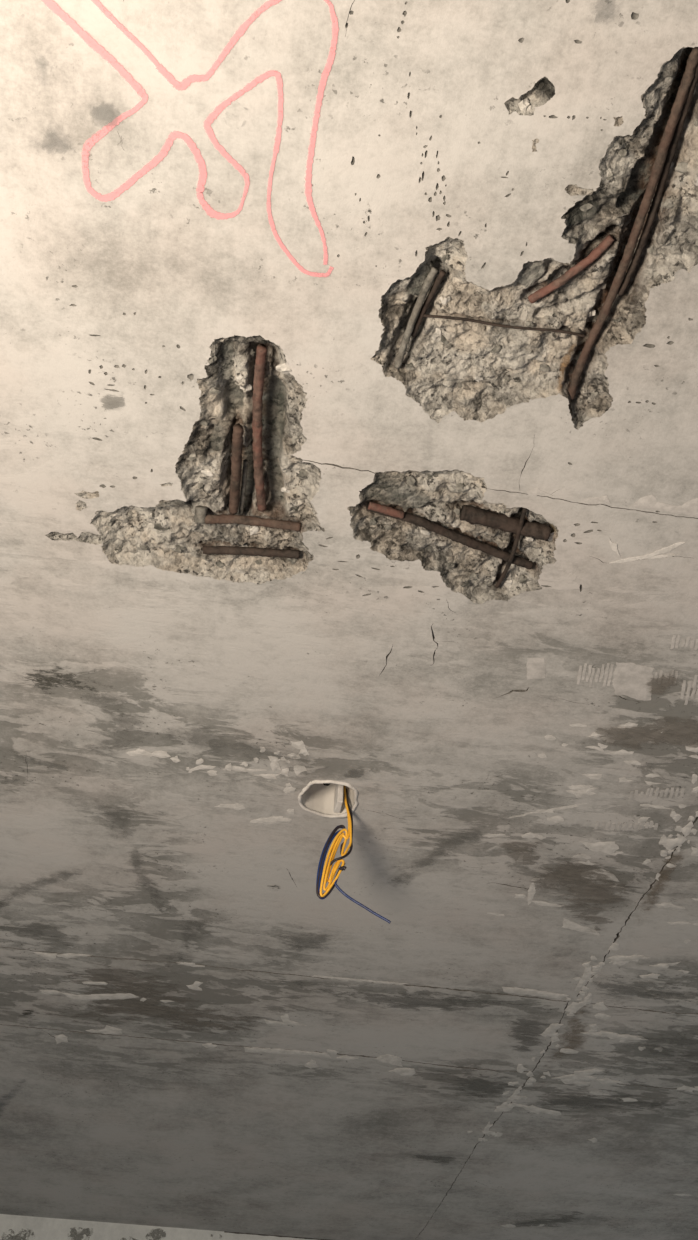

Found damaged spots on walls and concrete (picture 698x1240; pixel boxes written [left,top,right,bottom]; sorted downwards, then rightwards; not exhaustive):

spalling [371,47,698,430]
spalling [45,335,333,585]
crack [296,457,379,475]
crack [482,435,698,519]
spalling [333,469,602,604]
crack [431,599,456,666]
leakage [26,668,96,698]
leakage [600,719,698,749]
leakage [501,843,627,931]
leakage [58,968,253,1030]
crack [0,817,698,1236]
peeling [70,1228,91,1240]